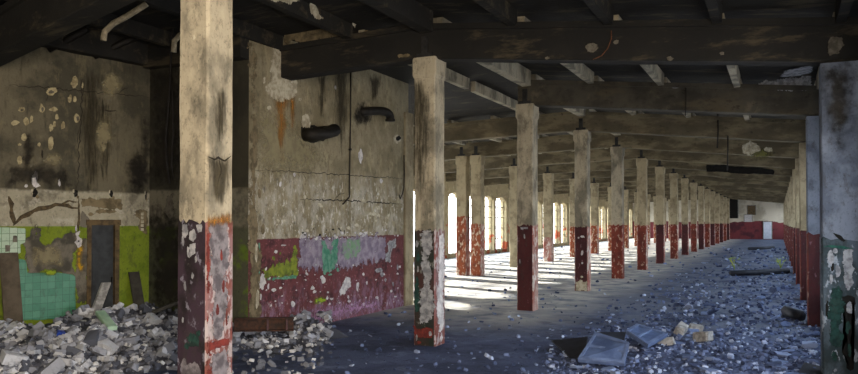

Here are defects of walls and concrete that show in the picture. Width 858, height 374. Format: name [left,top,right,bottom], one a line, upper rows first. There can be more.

peeling [11,88,80,165]
peeling [68,76,83,103]
crack [8,73,150,231]
rust [257,98,319,172]
flaking render [246,3,401,317]
flaking render [5,189,123,304]
peeling [181,222,231,374]
peeling [826,233,856,371]